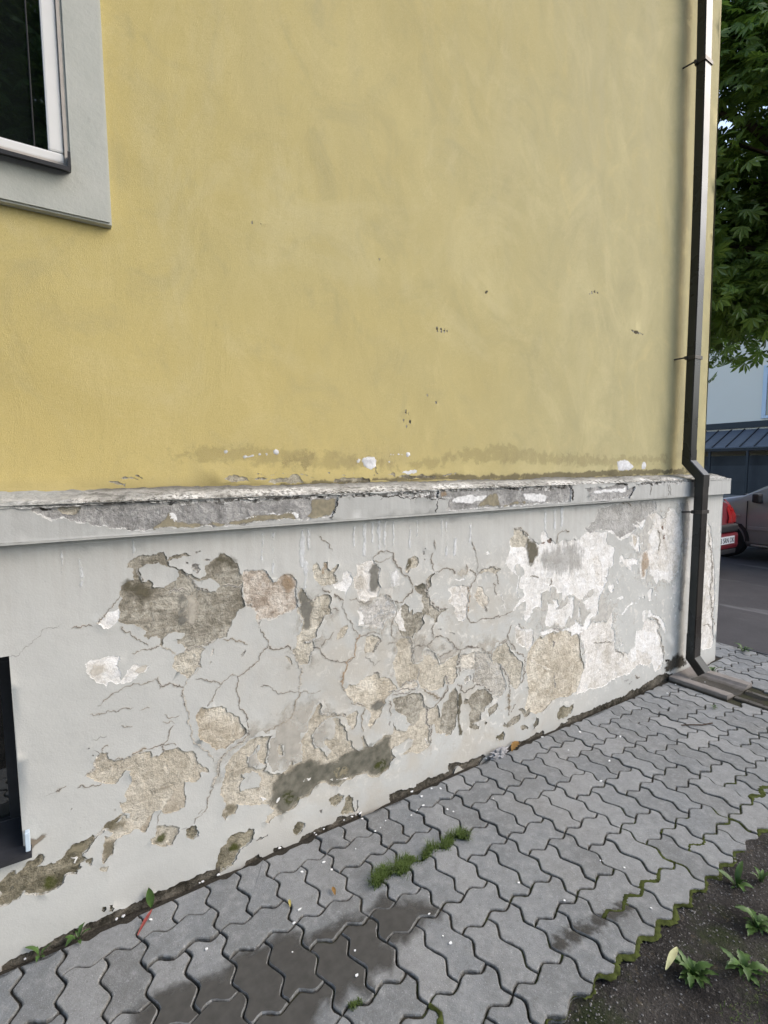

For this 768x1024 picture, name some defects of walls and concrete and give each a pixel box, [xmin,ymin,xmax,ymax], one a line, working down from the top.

damp [301,468,689,485]
crack [44,540,527,824]
flaking render [0,469,694,972]